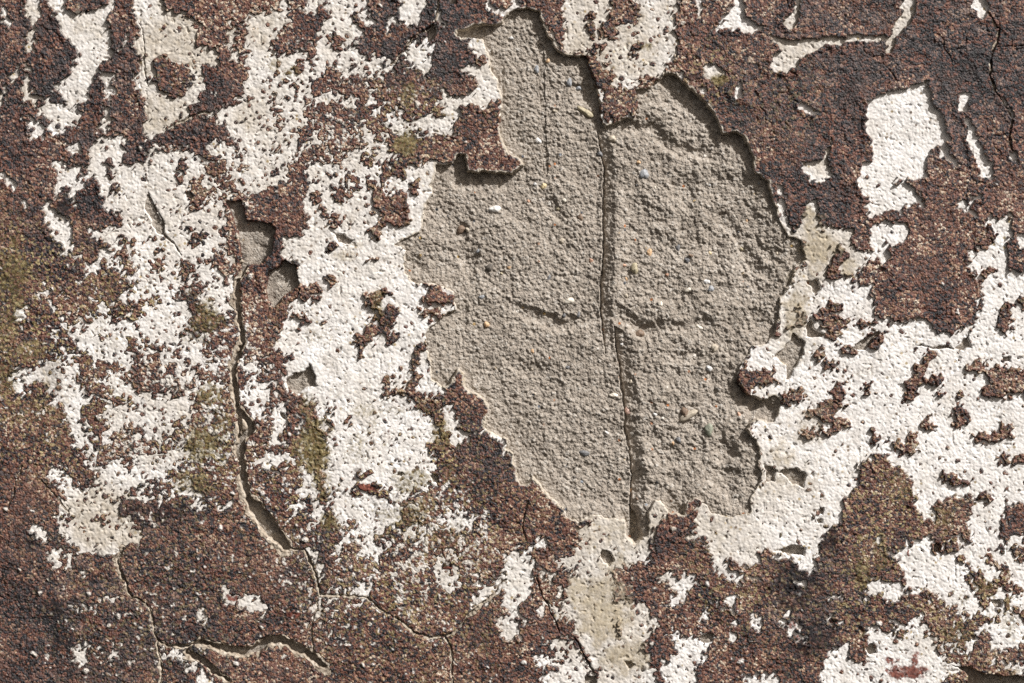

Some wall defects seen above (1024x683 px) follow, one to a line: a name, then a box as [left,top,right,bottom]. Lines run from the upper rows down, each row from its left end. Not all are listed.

peeling [1,7,14,33]
peeling [0,64,20,107]
peeling [0,172,29,209]
peeling [7,0,402,570]
crack [112,258,508,683]
crack [597,133,640,540]
flaking render [237,0,1024,683]
crack [986,11,1014,153]